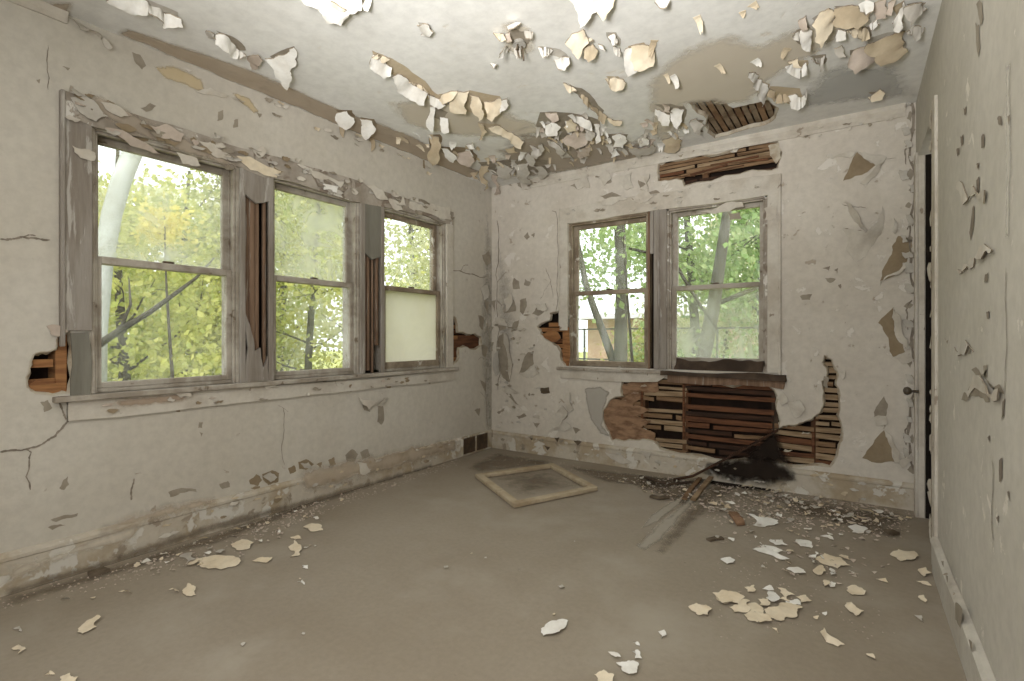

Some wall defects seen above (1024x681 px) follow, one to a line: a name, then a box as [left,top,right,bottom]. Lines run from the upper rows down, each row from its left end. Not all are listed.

peeling [301,0,372,26]
peeling [975,0,983,56]
peeling [64,88,455,221]
flaking render [314,0,927,221]
crack [0,233,49,241]
peeling [842,102,916,383]
peeling [955,163,993,274]
crack [0,403,69,490]
flaking render [25,324,72,412]
flaking render [443,278,914,526]
water stain [9,441,455,600]